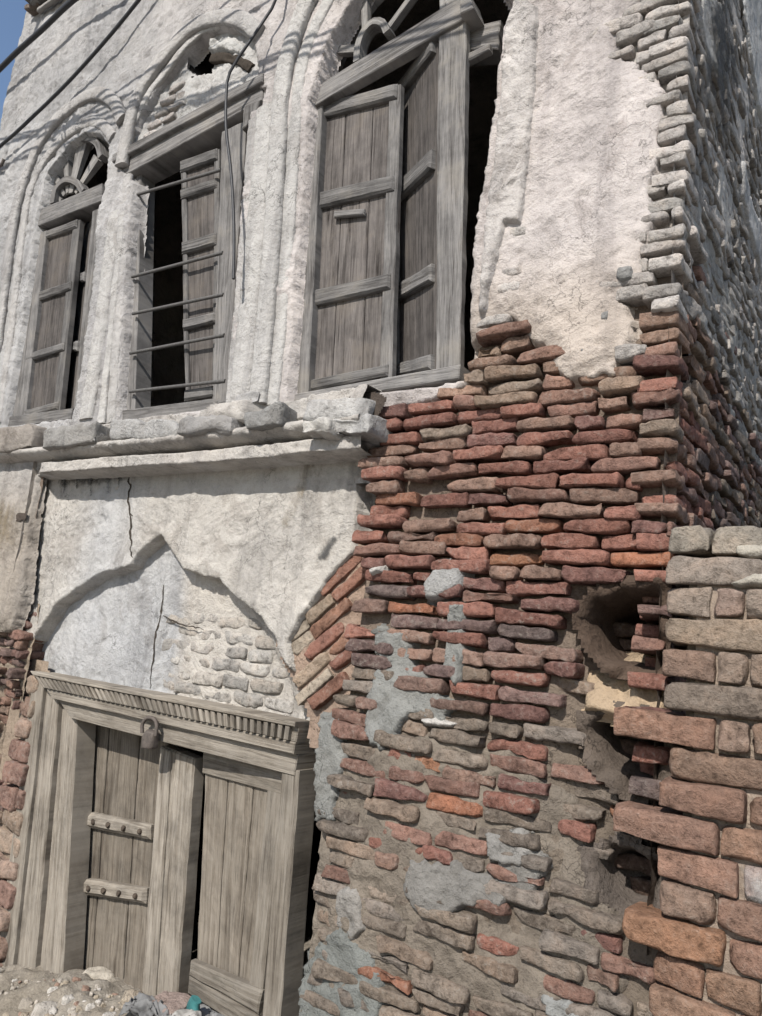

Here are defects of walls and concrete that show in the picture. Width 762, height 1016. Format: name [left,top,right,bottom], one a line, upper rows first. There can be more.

peeling [497,265,522,293]
peeling [505,226,526,238]
spalling [589,0,762,409]
crack [126,477,134,558]
crack [150,585,203,688]
spalling [0,314,690,1016]